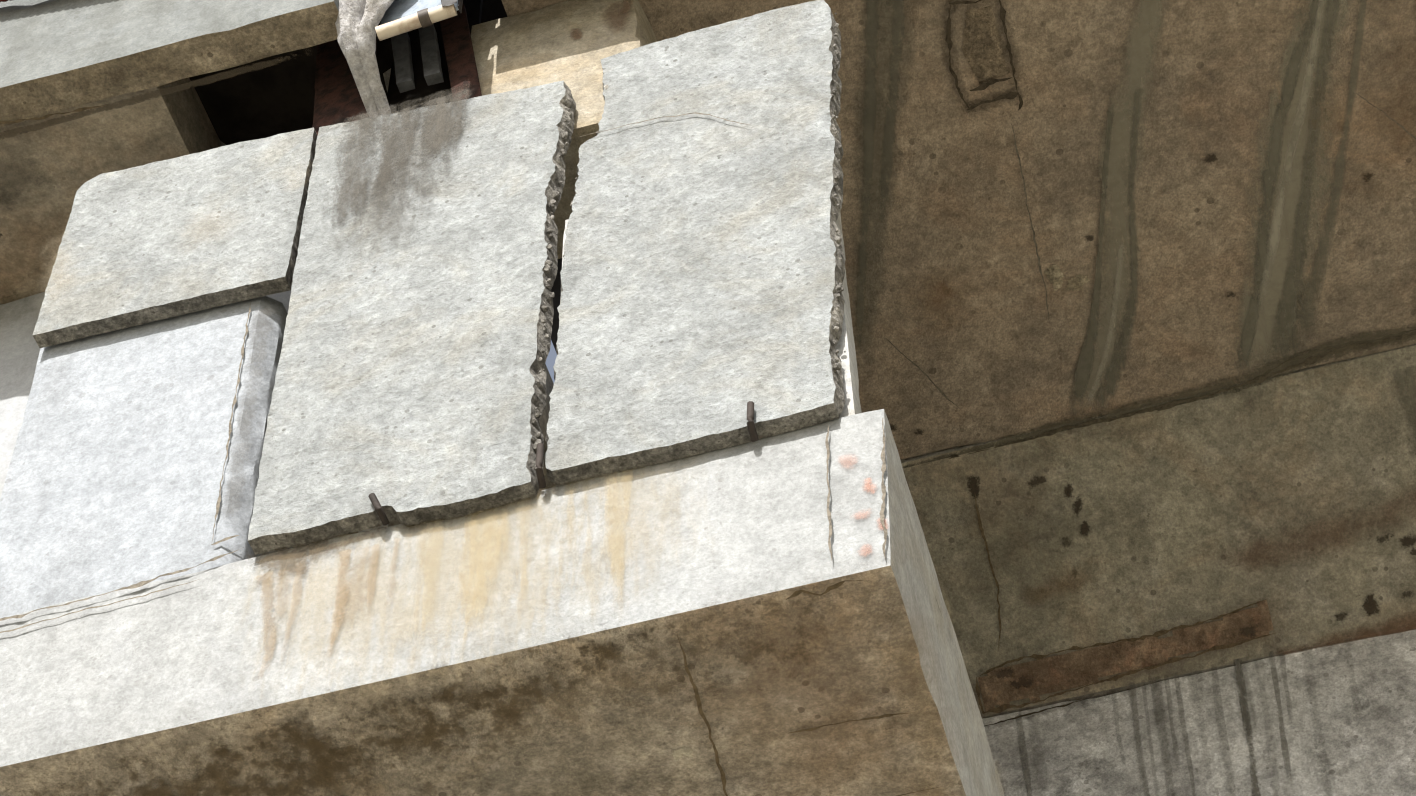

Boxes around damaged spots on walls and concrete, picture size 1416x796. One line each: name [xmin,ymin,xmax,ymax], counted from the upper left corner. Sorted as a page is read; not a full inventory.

leakage [337,86,467,212]
leakage [856,0,904,330]
leakage [1072,0,1162,407]
leakage [1239,0,1367,367]
crack [677,635,728,796]
crack [788,712,915,734]
leakage [1234,659,1261,796]
leakage [1270,653,1290,775]